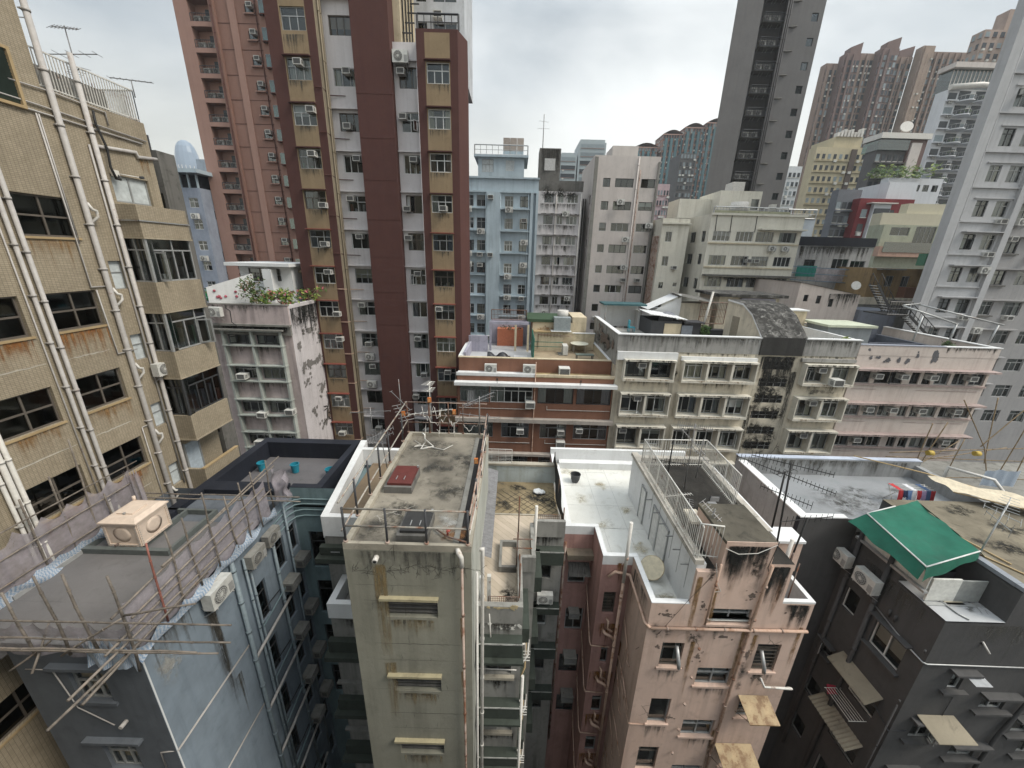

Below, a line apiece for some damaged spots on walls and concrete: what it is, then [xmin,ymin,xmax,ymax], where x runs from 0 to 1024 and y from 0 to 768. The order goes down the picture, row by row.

corrosion [0,340,34,359]
spalling [297,323,331,429]
water stain [655,336,806,461]
peeling [868,348,939,364]
water stain [712,546,791,595]
water stain [787,605,809,621]